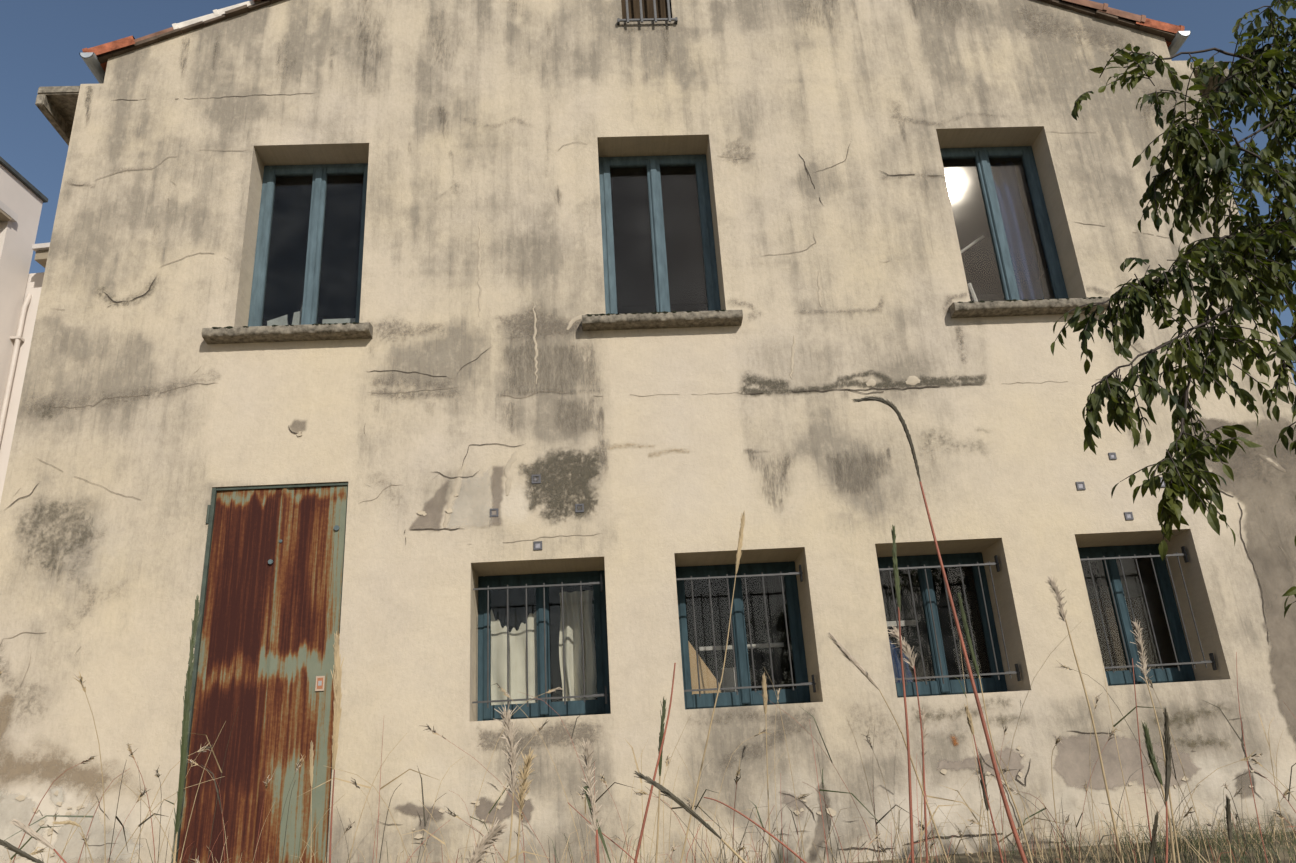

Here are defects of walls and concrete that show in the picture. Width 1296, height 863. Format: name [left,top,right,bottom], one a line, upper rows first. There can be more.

crack [799,147,849,203]
crack [50,252,230,310]
crack [366,349,488,393]
peeling [410,481,459,529]
peeling [490,467,503,524]